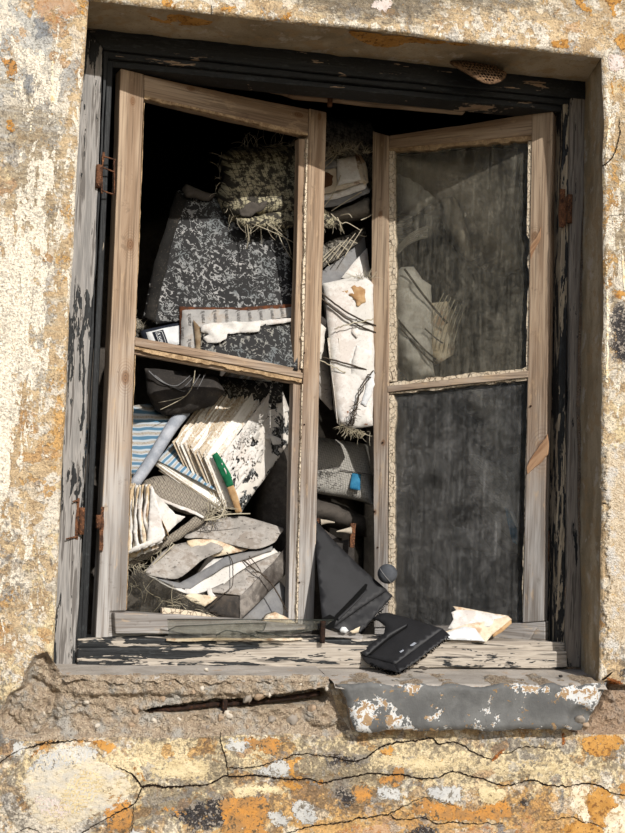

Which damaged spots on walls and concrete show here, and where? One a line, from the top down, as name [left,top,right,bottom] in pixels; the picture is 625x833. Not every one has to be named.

spalling [0,652,349,833]
crack [0,732,624,833]
spalling [569,681,625,757]